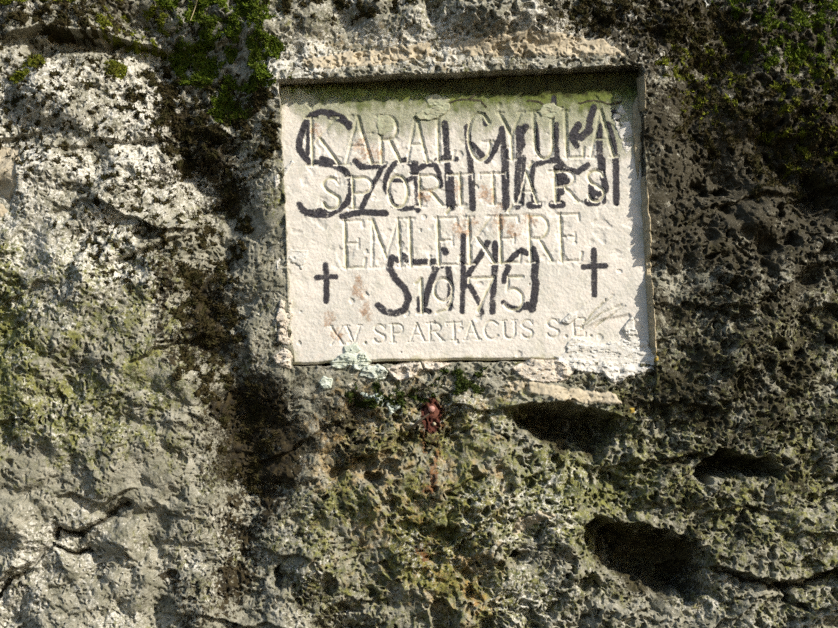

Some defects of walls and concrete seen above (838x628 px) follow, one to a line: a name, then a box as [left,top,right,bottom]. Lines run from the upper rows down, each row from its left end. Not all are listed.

corrosion [420,398,446,493]
crack [55,502,131,555]
crack [0,572,26,598]